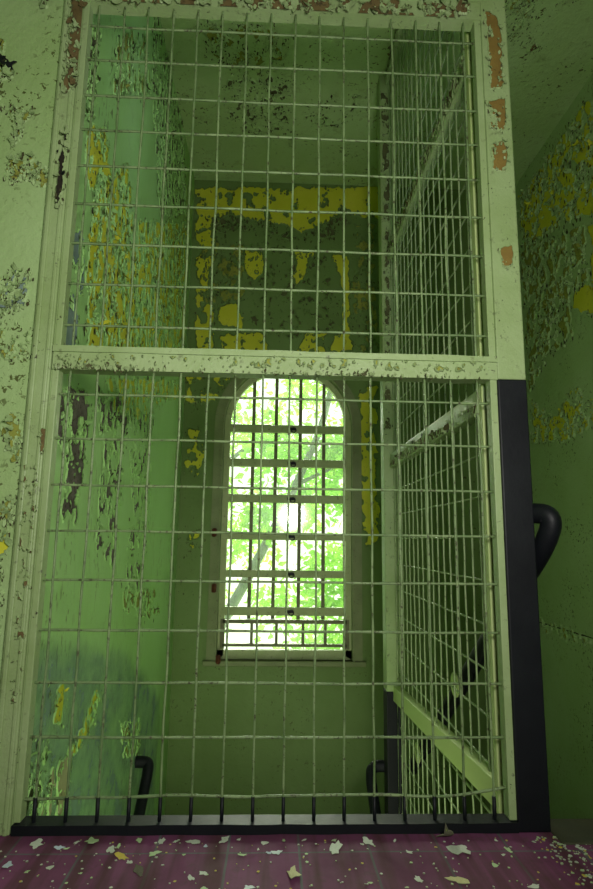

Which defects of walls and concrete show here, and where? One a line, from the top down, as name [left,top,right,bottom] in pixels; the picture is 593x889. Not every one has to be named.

peeling [483,0,547,173]
peeling [54,0,486,624]
peeling [37,428,46,454]
peeling [26,680,103,816]